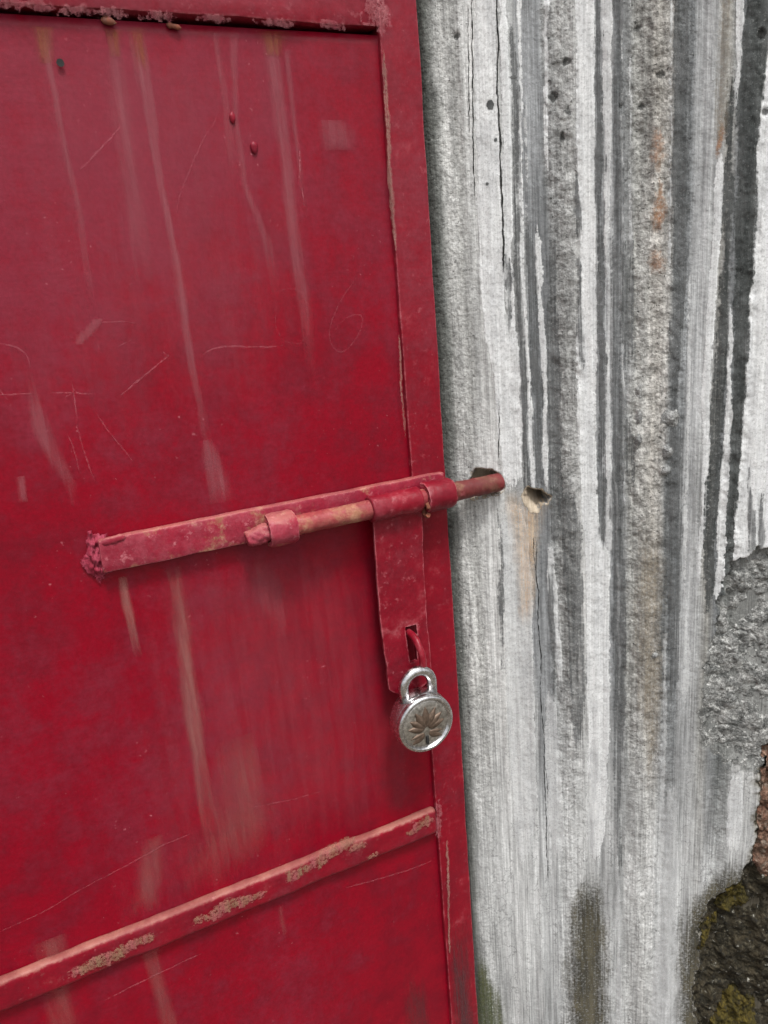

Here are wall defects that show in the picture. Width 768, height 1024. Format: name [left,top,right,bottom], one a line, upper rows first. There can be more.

crack [468,0,505,271]
spalling [521,486,552,513]
damp [497,0,587,746]
damp [594,0,636,866]
damp [664,0,768,703]
crack [533,537,548,875]
damp [568,884,609,1024]
damp [676,866,742,1024]
spalling [692,546,768,1024]